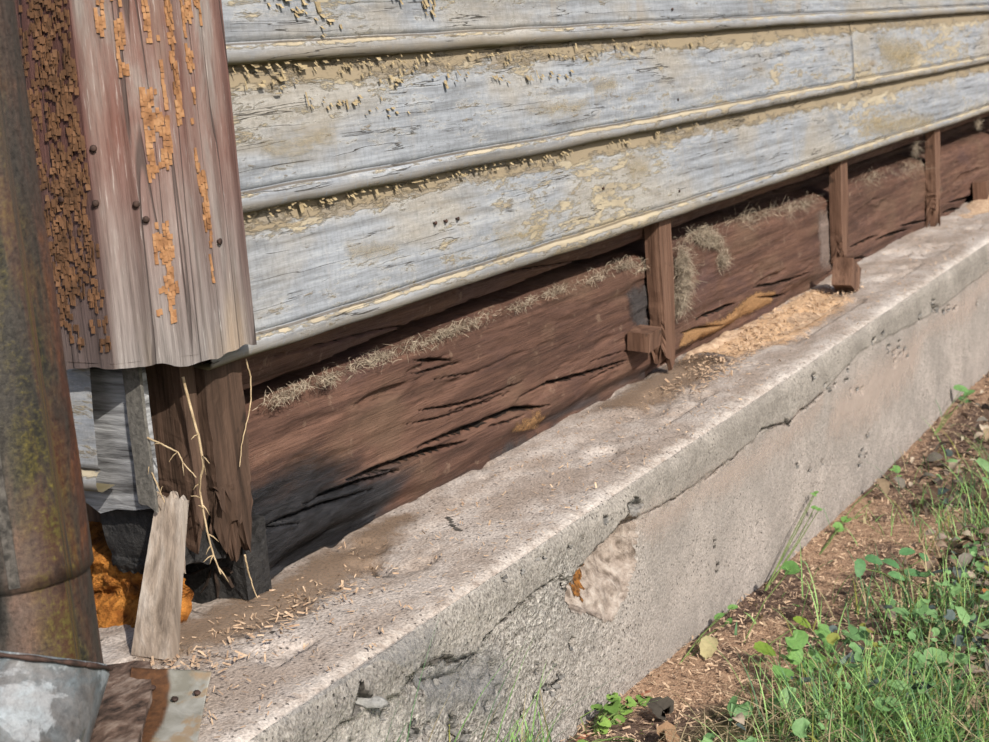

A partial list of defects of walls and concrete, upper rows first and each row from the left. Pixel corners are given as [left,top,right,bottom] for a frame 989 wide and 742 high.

peeling [139,0,203,183]
peeling [232,52,470,117]
peeling [19,0,111,353]
peeling [152,220,180,324]
peeling [247,149,573,218]
crack [850,196,968,259]
crack [417,358,468,376]
crack [333,363,616,494]
crack [757,392,823,435]
crack [445,516,460,530]
spalling [565,497,644,623]
crack [430,575,567,666]